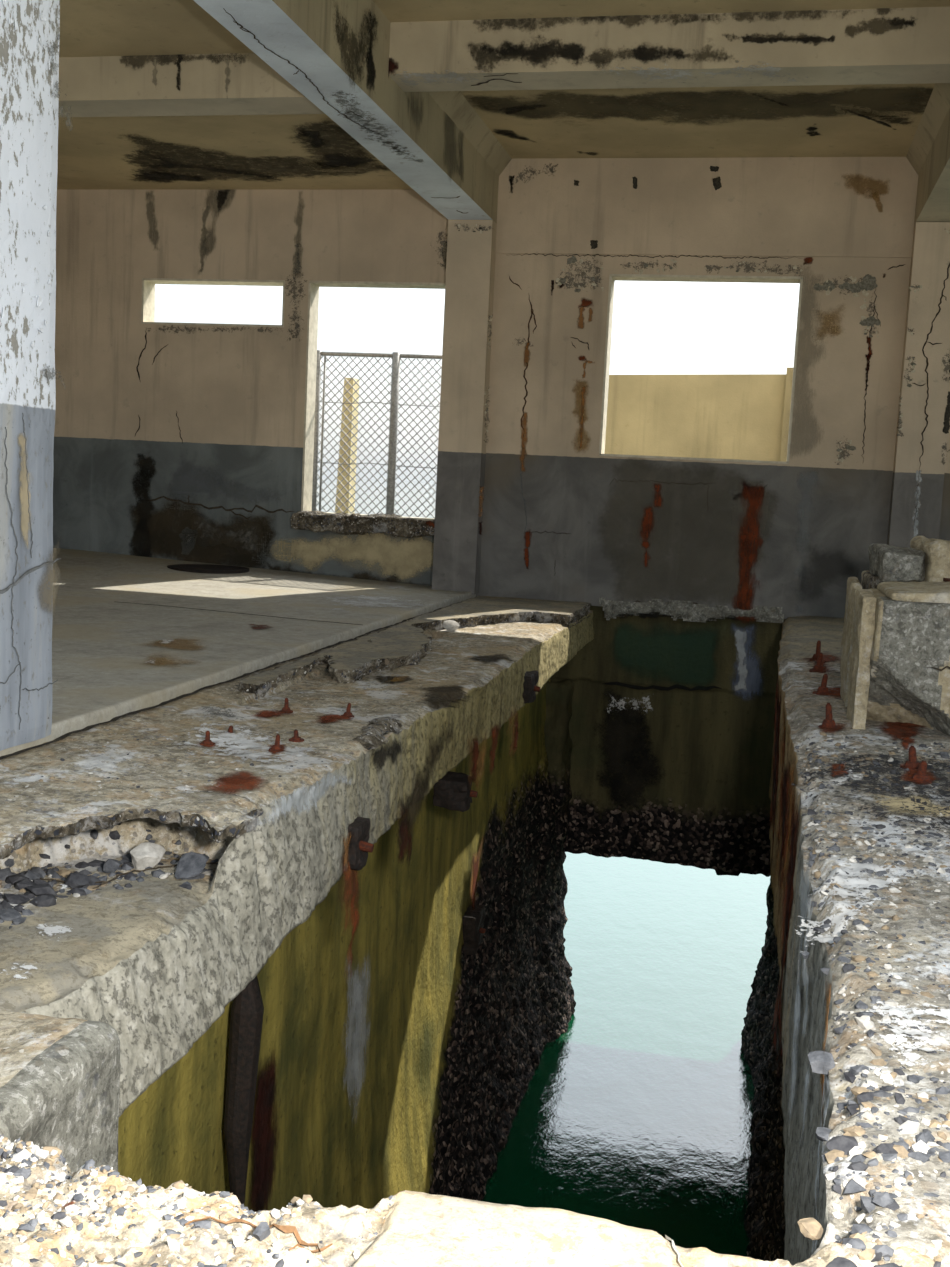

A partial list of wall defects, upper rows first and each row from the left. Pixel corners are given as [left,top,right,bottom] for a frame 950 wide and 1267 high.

water stain [126,121,390,271]
water stain [492,129,528,140]
water stain [396,8,934,136]
crack [507,253,792,442]
crack [913,263,950,528]
spalling [941,350,950,465]
crack [0,413,476,760]
corrosion [734,482,764,621]
spalling [0,787,263,859]
corrosion [208,771,263,793]
corrosion [318,714,352,723]
corrosion [770,677,798,1075]